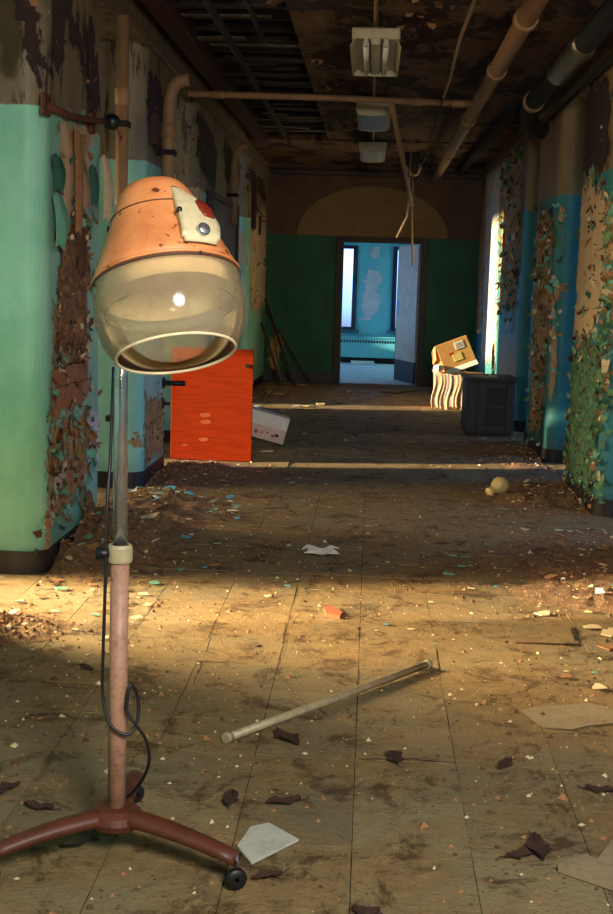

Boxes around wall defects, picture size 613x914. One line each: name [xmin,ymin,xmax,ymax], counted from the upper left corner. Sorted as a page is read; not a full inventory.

spalling [12,0,114,555]
peeling [128,382,166,473]
peeling [358,245,383,321]
peeling [475,76,613,508]